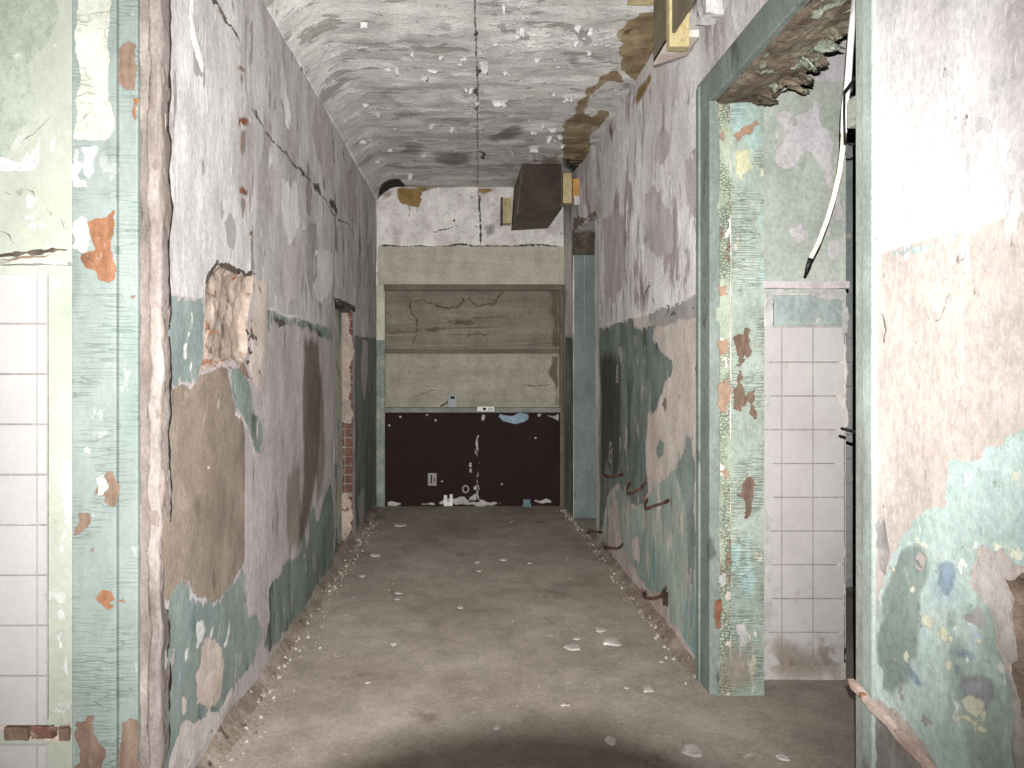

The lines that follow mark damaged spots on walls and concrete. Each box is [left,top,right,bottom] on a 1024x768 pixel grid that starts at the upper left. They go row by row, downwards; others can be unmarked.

crack [0,189,72,266]
crack [251,107,353,233]
crack [380,0,556,246]
water stain [564,158,583,172]
peeling [752,9,856,260]
flaking render [0,0,401,768]
crack [389,291,507,343]
peeling [717,327,771,420]
peeling [423,497,497,506]
peeling [599,295,696,660]
flaking render [737,477,773,582]
peeling [875,429,1024,768]